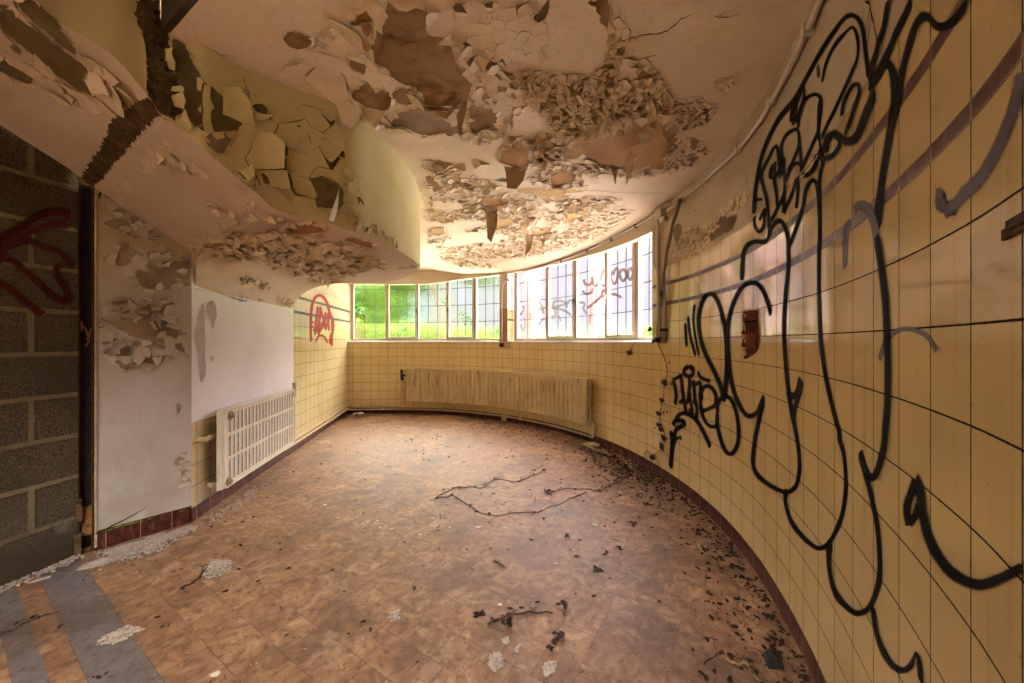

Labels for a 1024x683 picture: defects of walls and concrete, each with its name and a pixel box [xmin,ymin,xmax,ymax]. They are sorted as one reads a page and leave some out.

peeling [0,0,720,382]
peeling [669,191,749,262]